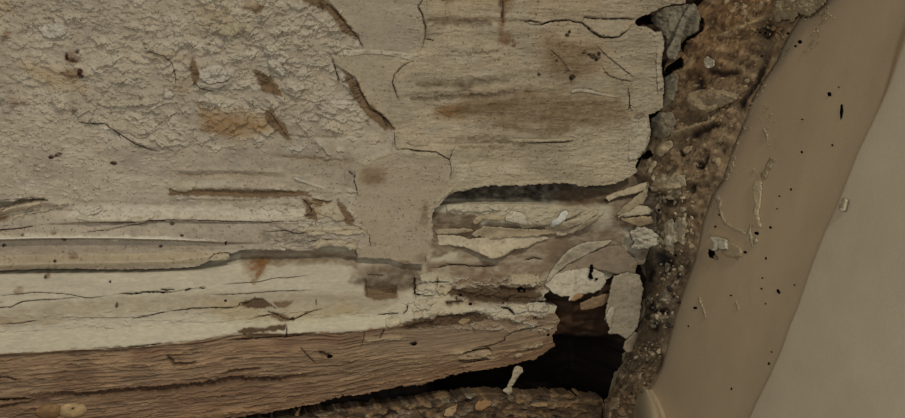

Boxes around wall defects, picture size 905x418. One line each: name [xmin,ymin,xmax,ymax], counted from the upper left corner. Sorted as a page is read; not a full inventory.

spalling [304,0,356,37]
crack [525,0,642,112]
peeling [585,14,665,91]
spalling [346,73,394,130]
crack [333,62,455,178]
crack [87,199,332,242]
peeling [434,209,598,259]
peeling [605,112,693,256]
crack [0,292,96,324]
crack [121,275,321,363]
crack [360,264,497,348]
peeling [385,240,644,353]